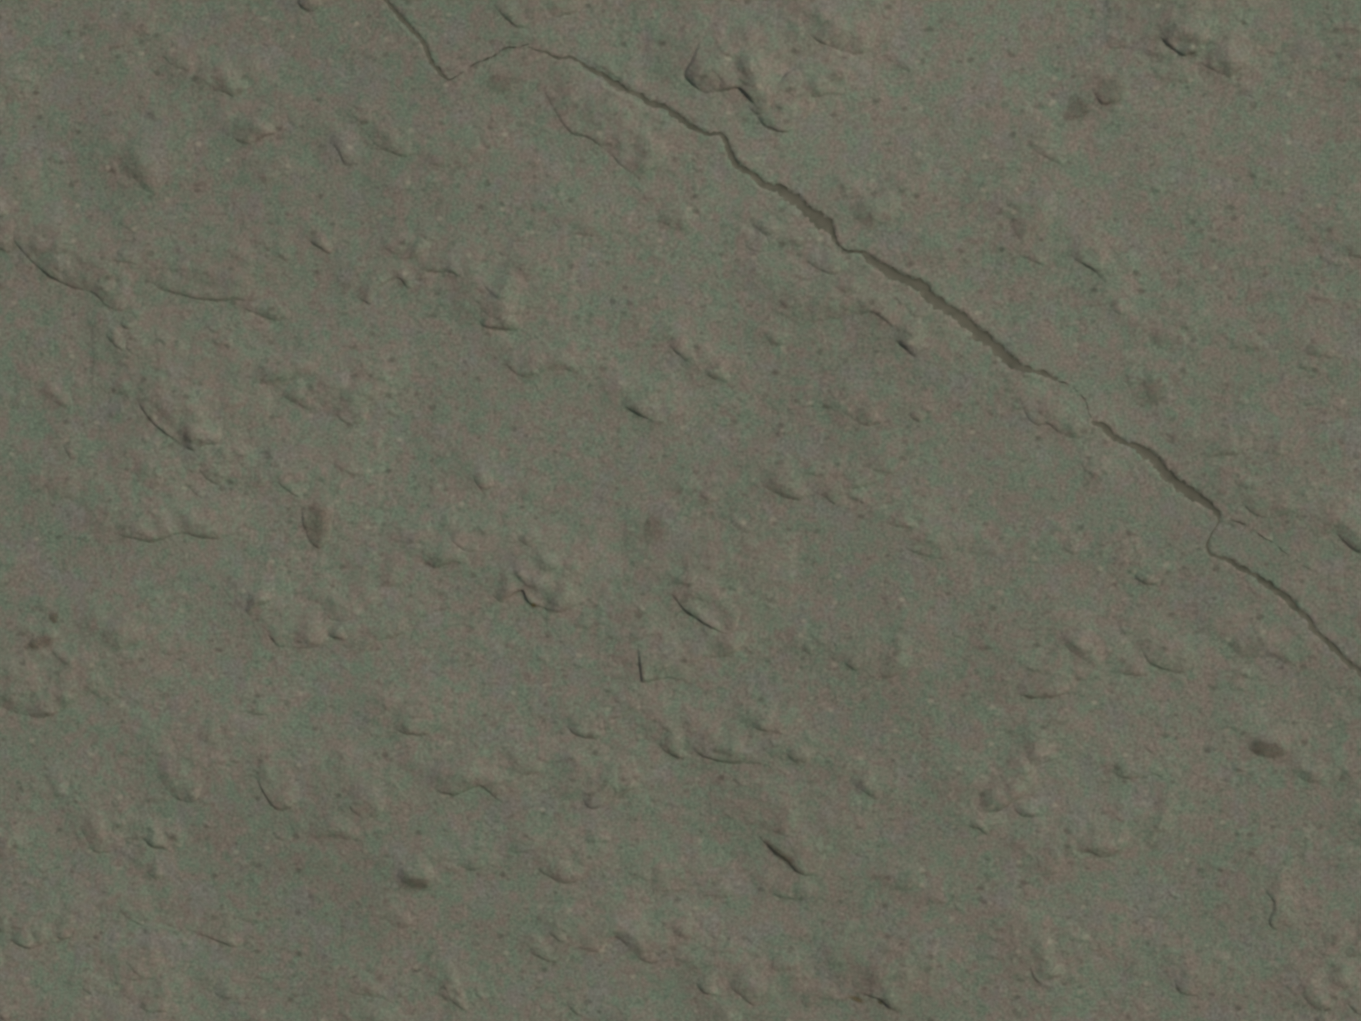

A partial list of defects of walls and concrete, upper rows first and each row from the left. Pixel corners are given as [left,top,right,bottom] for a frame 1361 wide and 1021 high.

crack [384,0,1361,677]